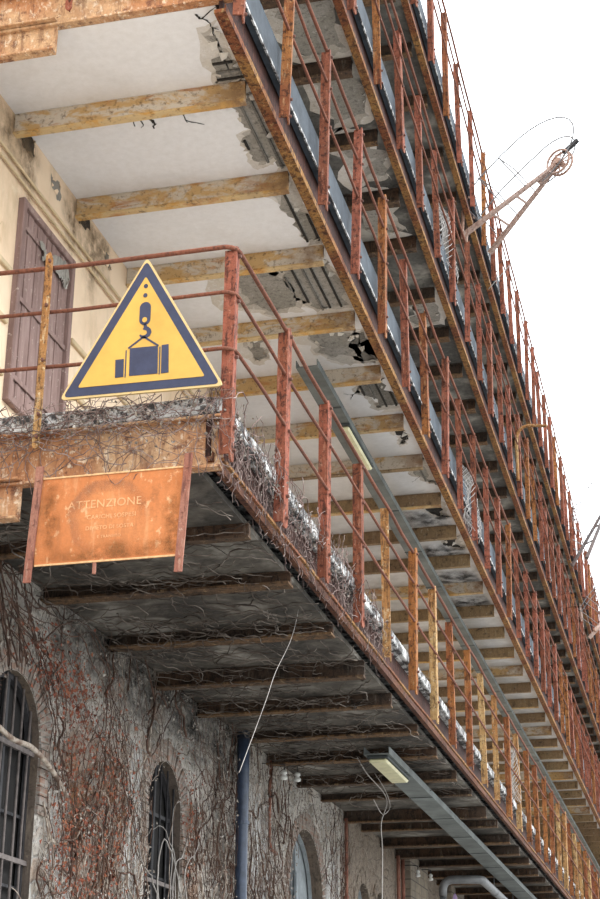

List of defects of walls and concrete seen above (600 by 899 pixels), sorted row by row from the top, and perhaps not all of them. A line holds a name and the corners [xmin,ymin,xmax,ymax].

crack [195,6,219,36]
peeling [196,20,324,247]
peeling [205,278,224,311]
peeling [238,259,356,319]
peeling [237,340,271,366]
peeling [293,328,402,413]